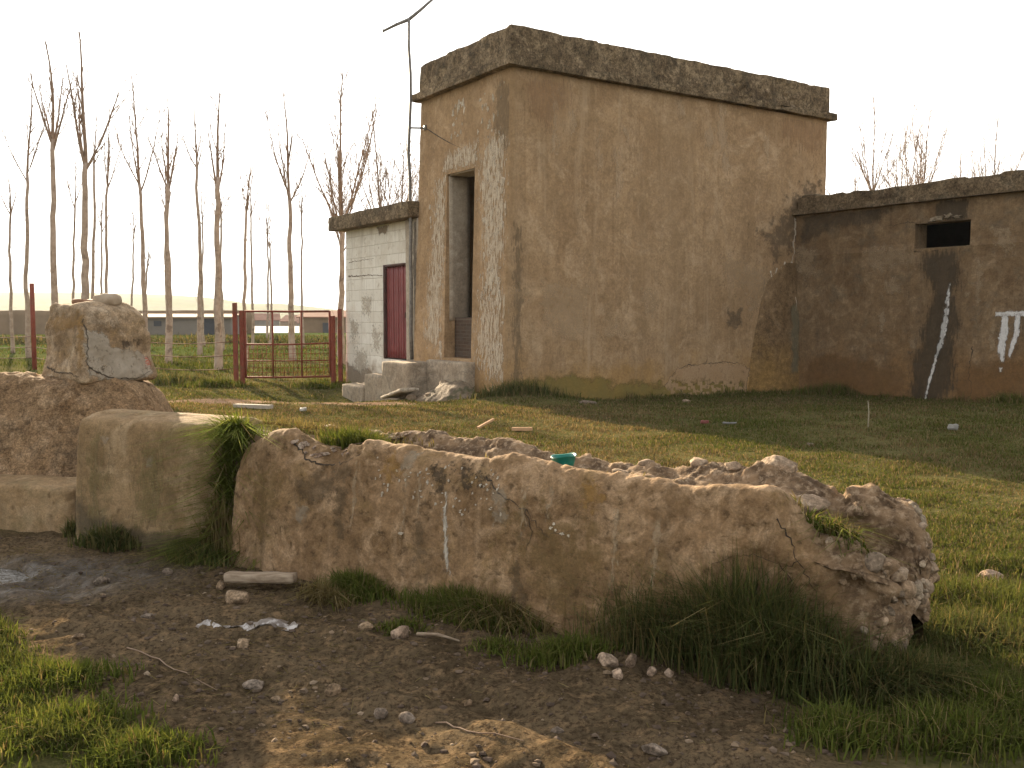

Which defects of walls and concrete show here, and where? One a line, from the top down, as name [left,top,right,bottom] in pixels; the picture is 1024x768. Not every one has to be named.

peeling [422,81,510,386]
damp [756,180,882,281]
crack [47,319,150,379]
damp [864,242,960,400]
crack [487,479,569,550]
crack [710,518,820,607]